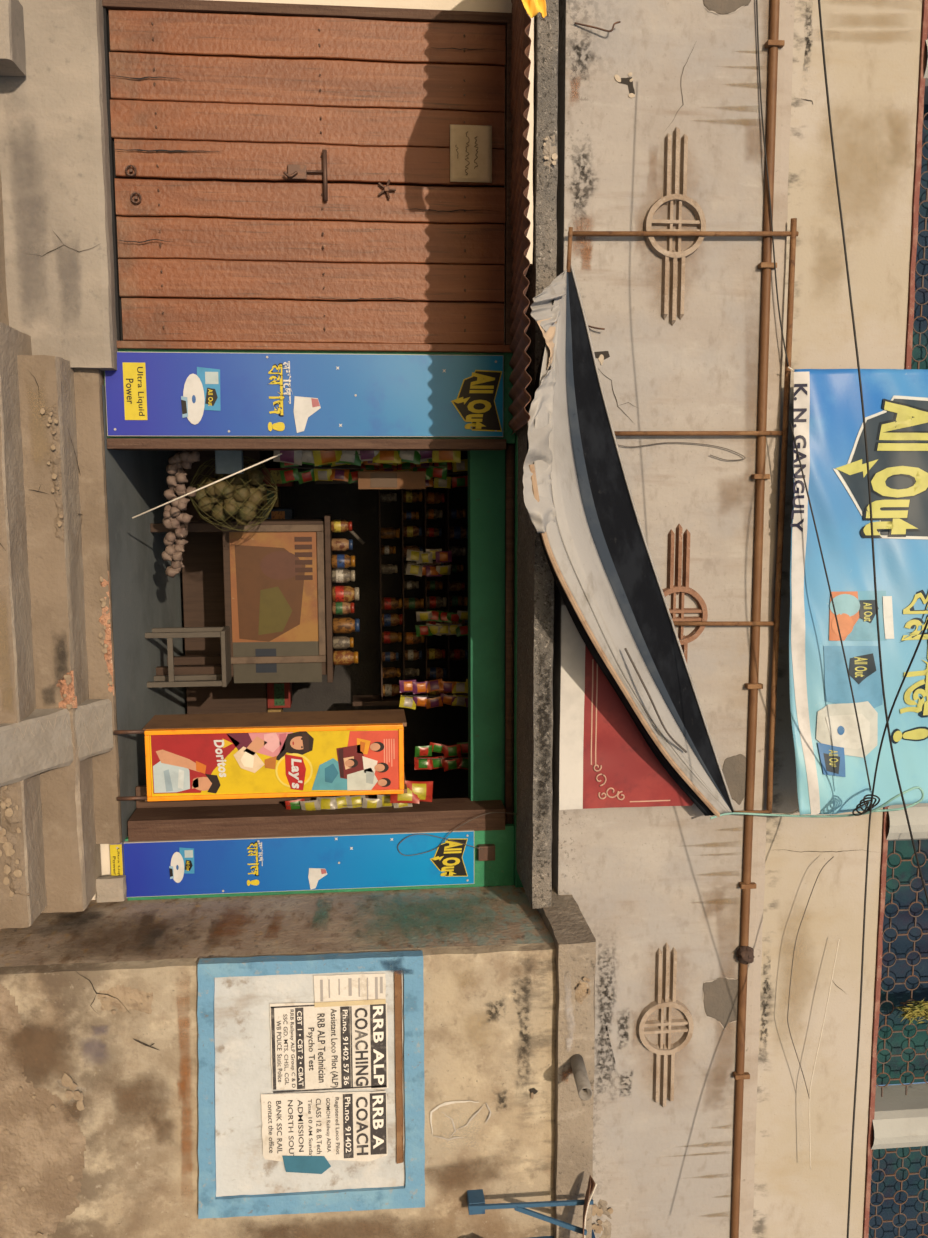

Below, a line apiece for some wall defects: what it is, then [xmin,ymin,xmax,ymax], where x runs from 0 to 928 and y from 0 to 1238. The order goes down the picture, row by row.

leakage [571,154,593,206]
leakage [598,953,632,1093]